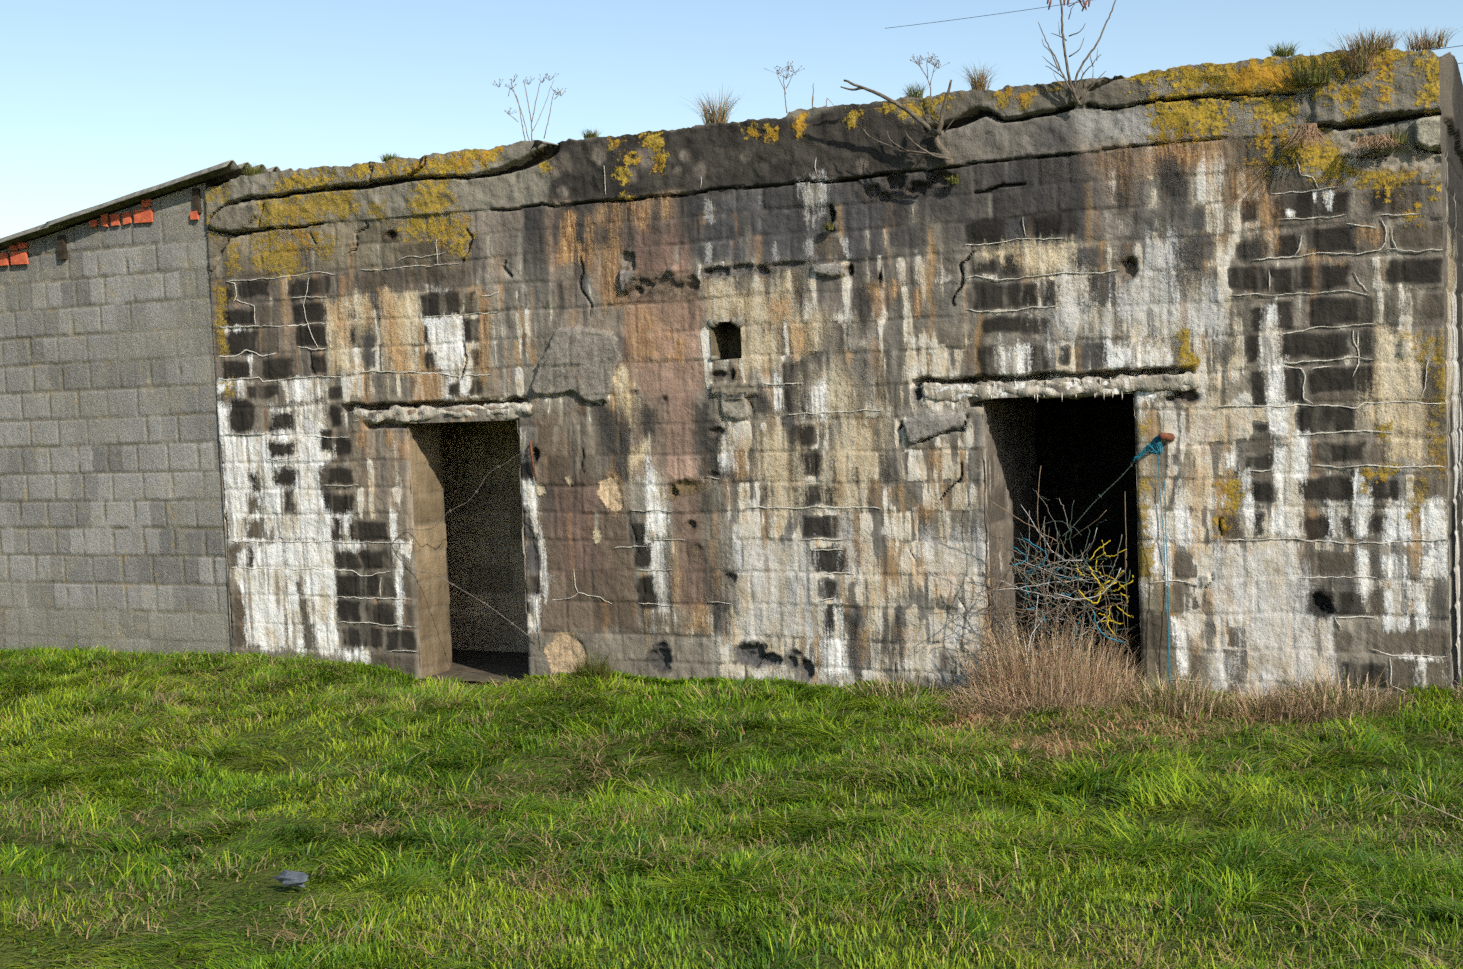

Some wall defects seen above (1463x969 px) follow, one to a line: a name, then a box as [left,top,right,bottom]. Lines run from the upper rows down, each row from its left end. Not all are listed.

crack [935,78,1296,130]
crack [1318,114,1442,159]
crack [207,139,1221,460]
crack [1219,159,1446,475]
damp [217,285,471,665]
damp [1138,479,1195,597]
damp [1209,304,1336,694]
damp [1325,287,1463,692]
peeling [544,631,587,674]
spalling [647,642,672,673]
spalling [734,641,814,679]
damp [1170,616,1189,677]